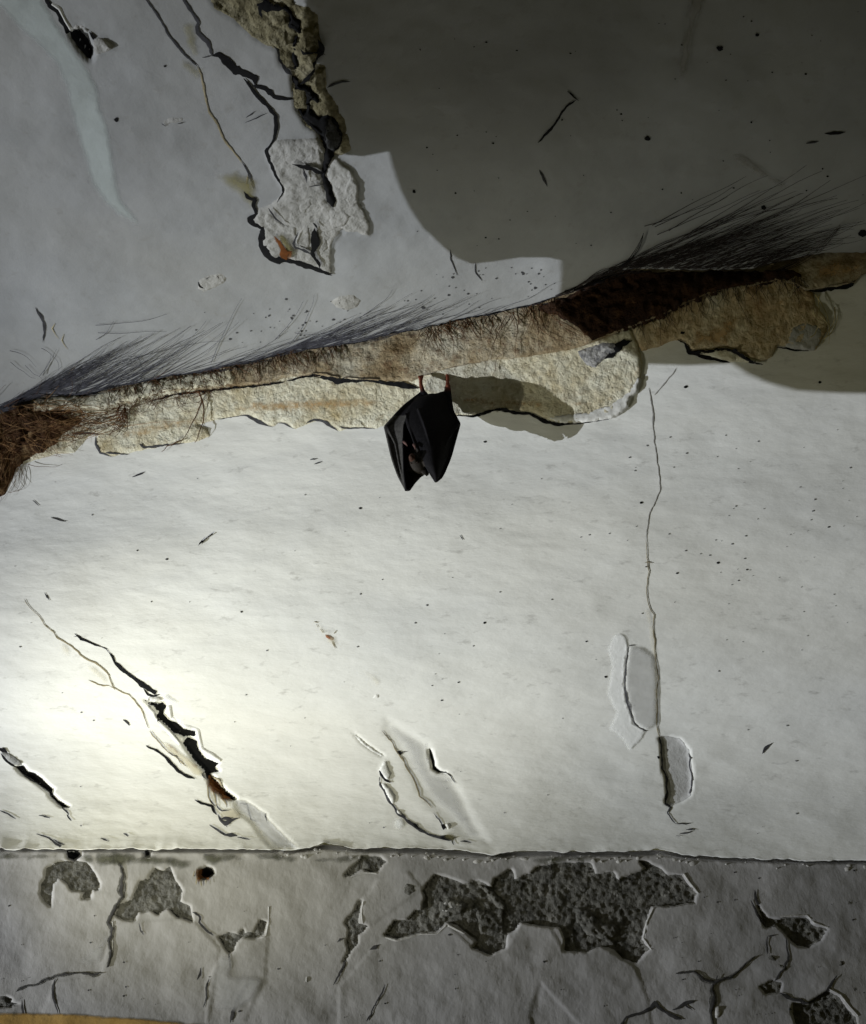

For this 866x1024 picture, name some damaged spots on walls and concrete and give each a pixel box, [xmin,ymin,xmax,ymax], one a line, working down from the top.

crack [146,0,350,276]
flaking render [211,0,370,273]
rust [274,236,292,260]
crack [624,340,808,823]
crack [0,748,71,847]
crack [24,599,267,840]
rust [150,732,231,807]
crack [379,731,471,845]
spalling [40,860,99,905]
spalling [116,867,192,921]
spalling [370,861,699,962]
spalling [751,891,828,970]